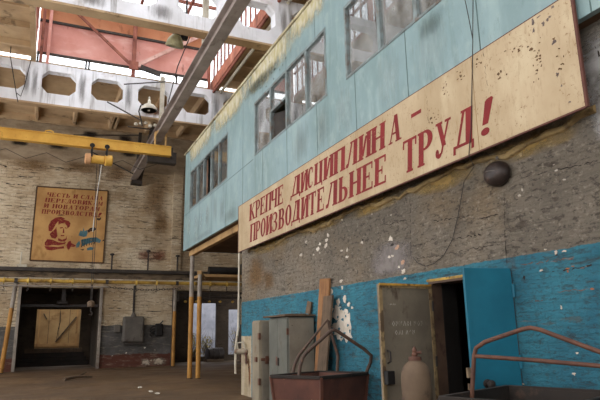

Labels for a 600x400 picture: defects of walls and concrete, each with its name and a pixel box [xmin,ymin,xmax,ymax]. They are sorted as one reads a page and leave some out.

leakage [190,0,322,158]
peeling [330,279,353,343]